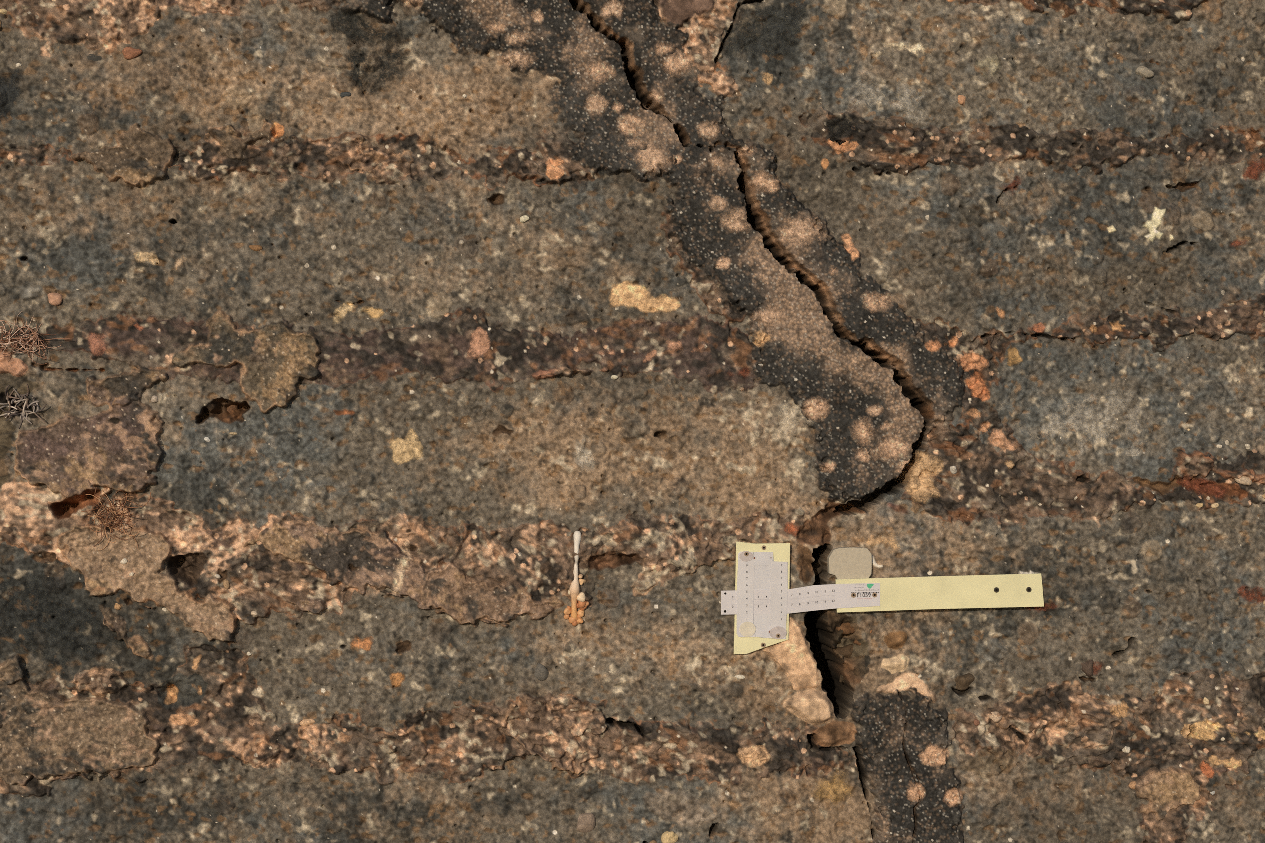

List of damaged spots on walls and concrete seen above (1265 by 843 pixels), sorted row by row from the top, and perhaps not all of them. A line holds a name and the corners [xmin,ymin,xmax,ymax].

crack [569,0,937,517]
peeling [0,310,327,660]
peeling [244,511,805,627]
peeling [0,656,169,795]
spalling [157,673,210,711]
crack [605,718,647,739]
crack [709,823,721,839]
crack [795,542,876,843]
crack [898,691,924,843]